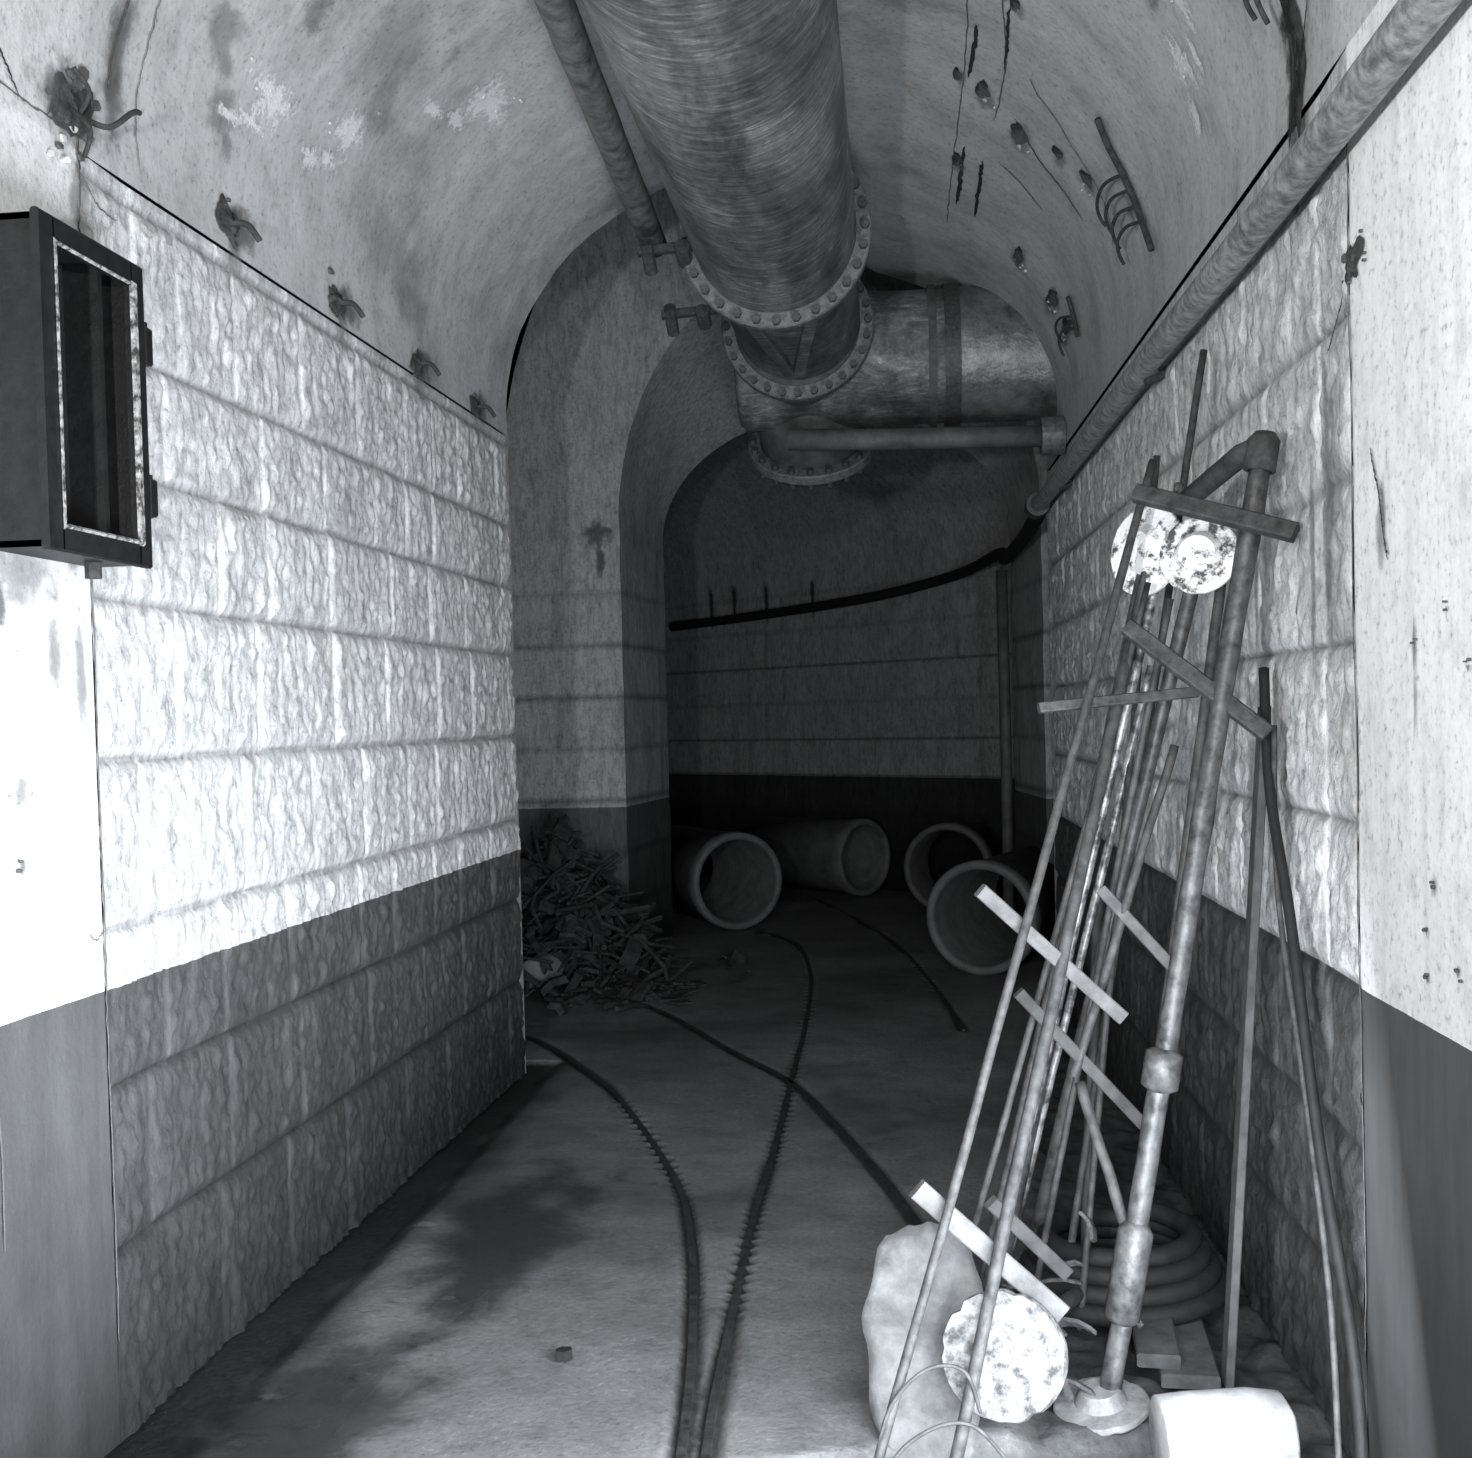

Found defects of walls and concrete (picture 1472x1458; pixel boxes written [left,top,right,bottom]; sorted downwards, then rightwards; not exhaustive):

crack [107,0,161,172]
leakage [429,1175,600,1323]
leakage [193,1349,413,1458]